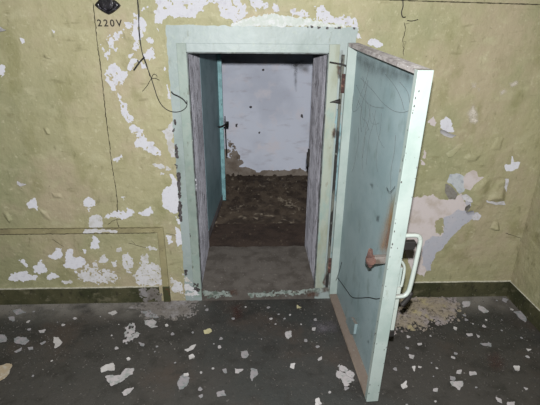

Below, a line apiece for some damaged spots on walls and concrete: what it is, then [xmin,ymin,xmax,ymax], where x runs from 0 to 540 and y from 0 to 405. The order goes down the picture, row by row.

peeling [154,0,362,39]
peeling [100,6,161,156]
peeling [8,197,163,302]
peeling [152,163,182,247]
peeling [162,121,175,157]
peeling [392,170,484,276]
peeling [428,117,456,138]
peeling [504,156,520,171]